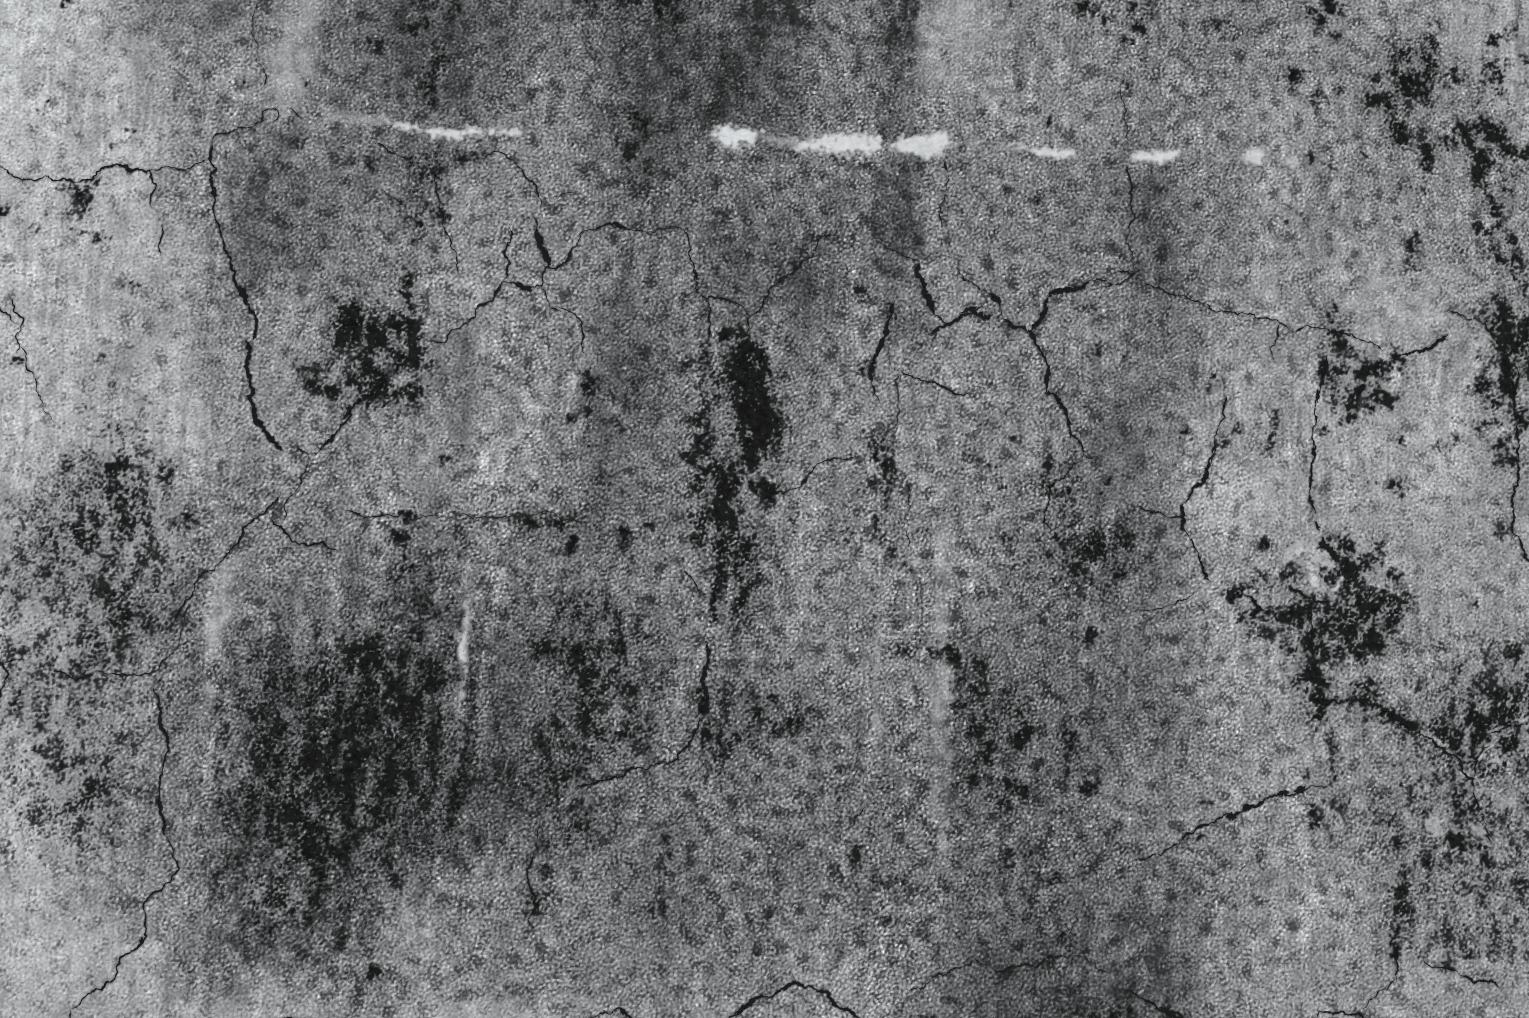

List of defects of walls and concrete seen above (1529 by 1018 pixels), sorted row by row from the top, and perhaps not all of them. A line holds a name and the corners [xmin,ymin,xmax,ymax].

water stain [0,403,219,867]
crack [0,0,360,1018]
water stain [293,265,433,420]
water stain [199,507,674,967]
crack [372,142,833,353]
water stain [566,322,798,639]
crack [729,974,859,1018]
crack [1134,395,1227,612]
crack [868,79,1529,563]
crack [1135,784,1330,861]
water stain [1221,527,1529,979]
water stain [1275,20,1529,473]